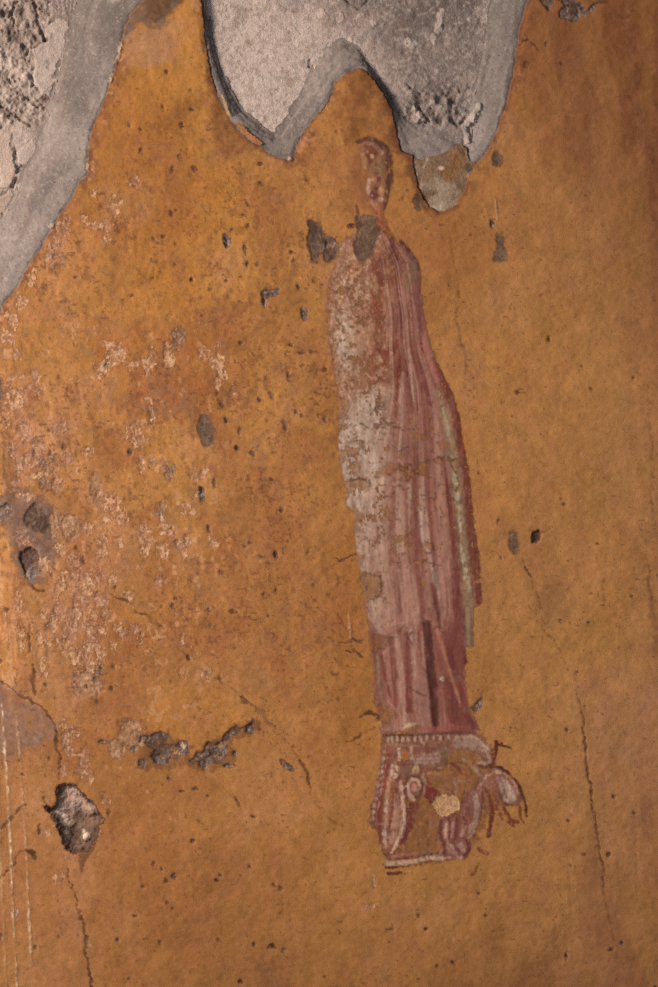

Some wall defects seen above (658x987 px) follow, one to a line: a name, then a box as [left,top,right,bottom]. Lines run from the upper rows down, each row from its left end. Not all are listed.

spalling [541,0,613,22]
flaking render [201,0,529,212]
spalling [306,220,339,262]
spalling [353,215,380,261]
spalling [490,199,507,262]
spalling [261,288,280,308]
peeling [94,325,186,380]
peeling [198,342,228,423]
peeling [0,367,216,704]
spalling [99,718,255,781]
crack [581,712,604,888]
crack [67,868,93,987]